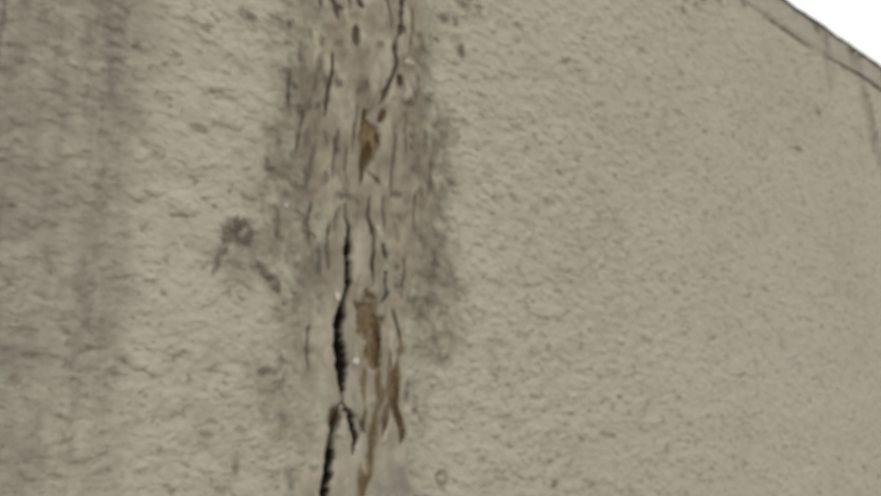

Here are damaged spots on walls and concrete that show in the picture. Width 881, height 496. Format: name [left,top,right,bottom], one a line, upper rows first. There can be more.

crack [324,52,356,184]
crack [319,0,364,46]
crack [378,0,412,105]
crack [306,138,405,496]